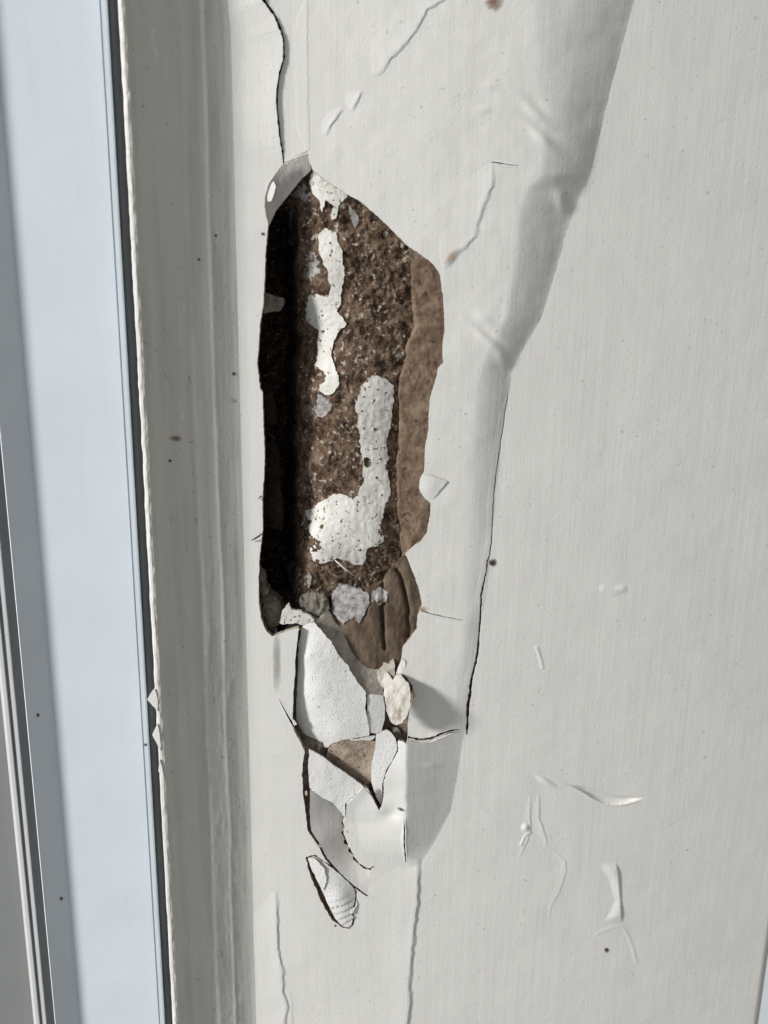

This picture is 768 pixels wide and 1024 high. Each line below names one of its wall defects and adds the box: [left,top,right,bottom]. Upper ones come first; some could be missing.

crack [228,0,446,165]
spalling [251,154,445,928]
crack [408,394,512,744]
crack [366,819,422,1024]